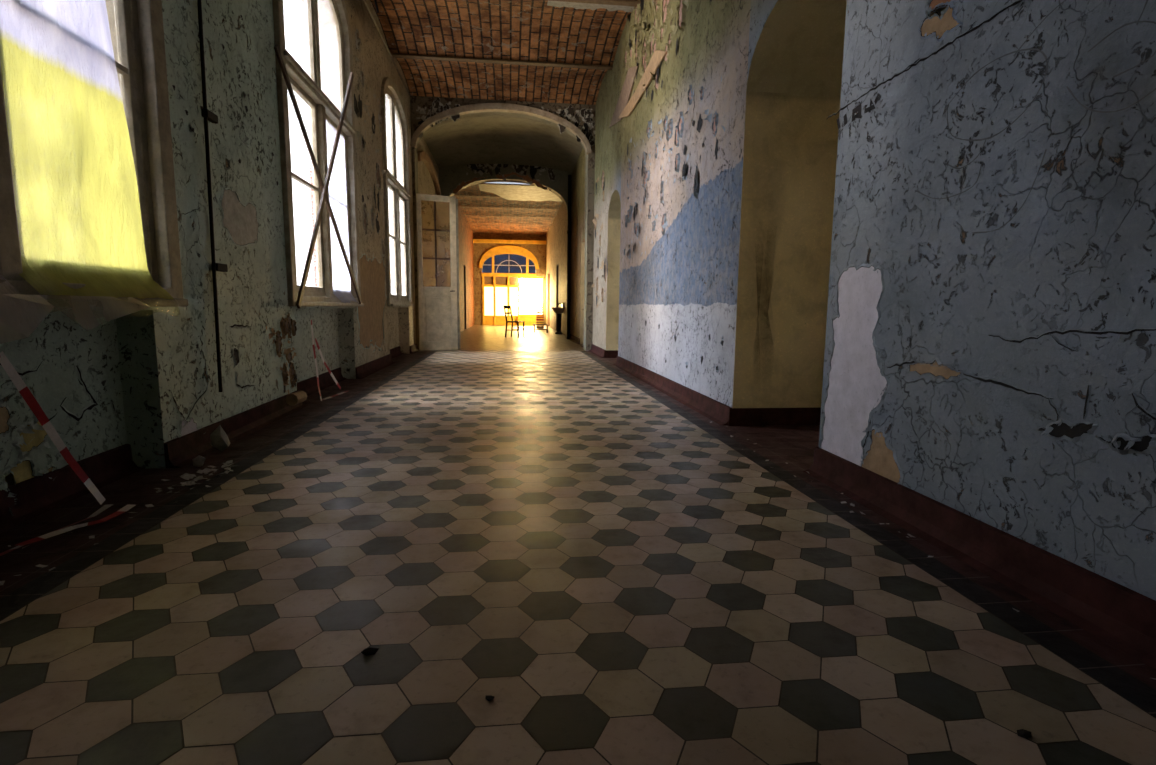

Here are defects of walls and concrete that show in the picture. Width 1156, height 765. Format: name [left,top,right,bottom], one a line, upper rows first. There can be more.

peeling [624,0,689,106]
crack [826,0,1022,120]
peeling [918,0,963,43]
peeling [582,170,608,311]
peeling [624,85,726,259]
peeling [820,262,903,484]